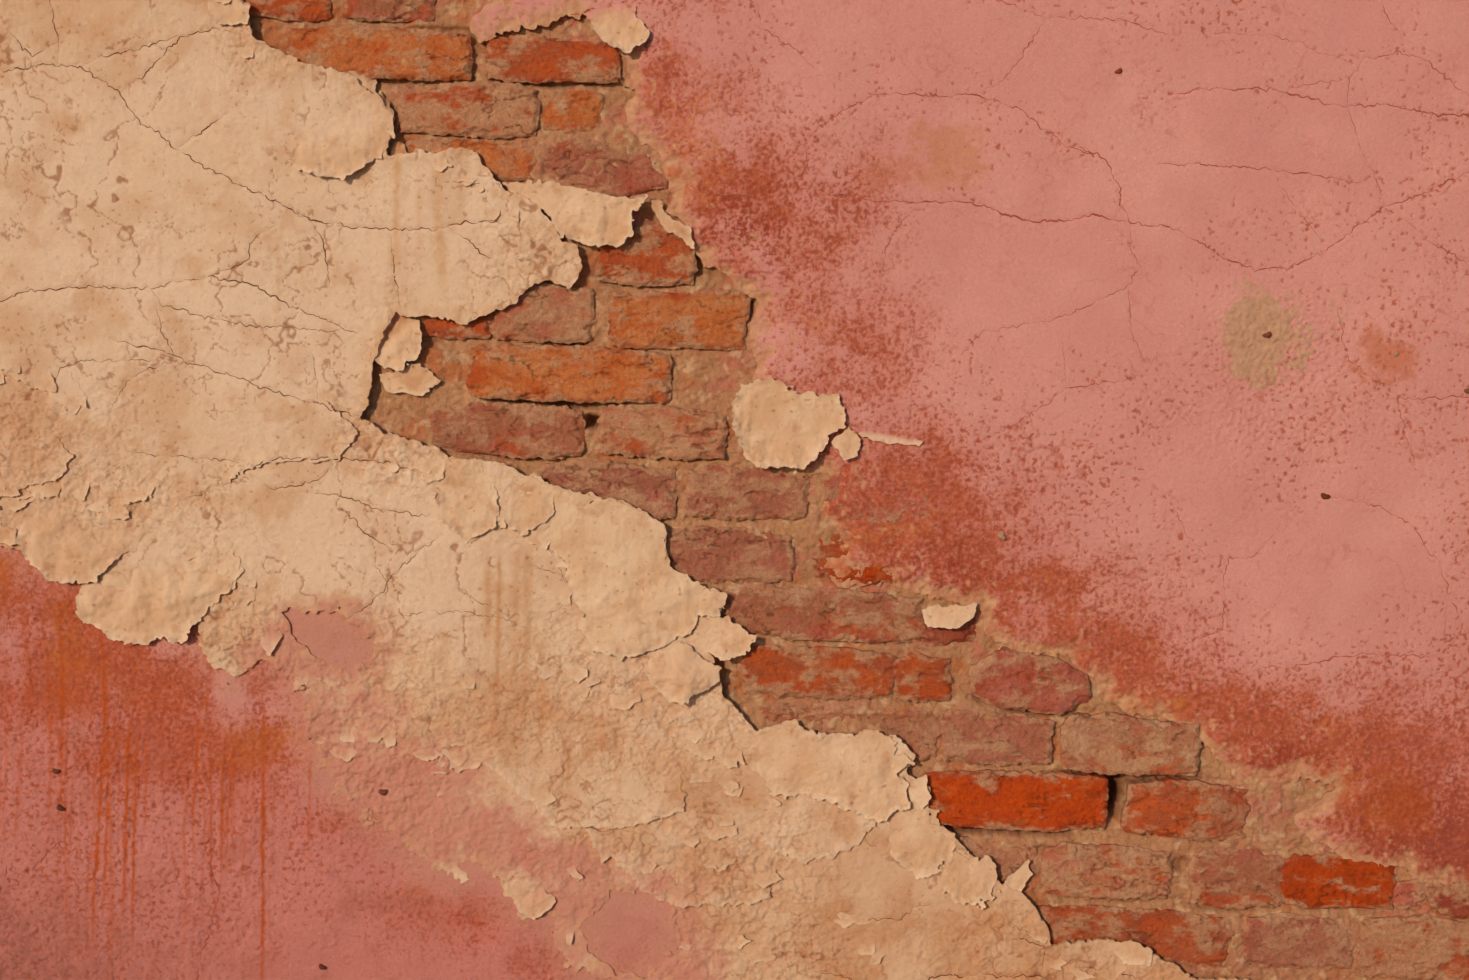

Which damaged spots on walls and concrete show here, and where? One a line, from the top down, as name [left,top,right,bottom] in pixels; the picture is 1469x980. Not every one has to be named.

crack [0,0,506,417]
spalling [227,0,960,610]
crack [685,0,1469,439]
crack [1337,307,1469,465]
corrosion [0,544,150,980]
corrosion [191,711,317,780]
crack [142,452,581,628]
peeling [412,737,771,909]
peeling [539,490,757,661]
peeling [645,641,722,706]
spalling [713,586,1469,980]
crack [1255,497,1465,699]